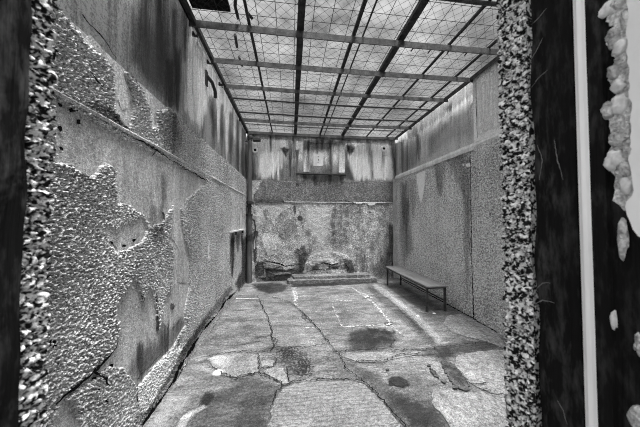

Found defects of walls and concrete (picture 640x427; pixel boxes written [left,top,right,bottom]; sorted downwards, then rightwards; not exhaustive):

flaking render [64,16,166,132]
leakage [133,0,245,176]
leakage [257,131,396,180]
flaking render [52,101,205,414]
flaking render [254,194,306,281]
crack [136,153,496,427]
crack [56,342,118,405]
leakage [276,347,312,378]
leakage [349,328,395,350]
leakage [388,376,410,388]